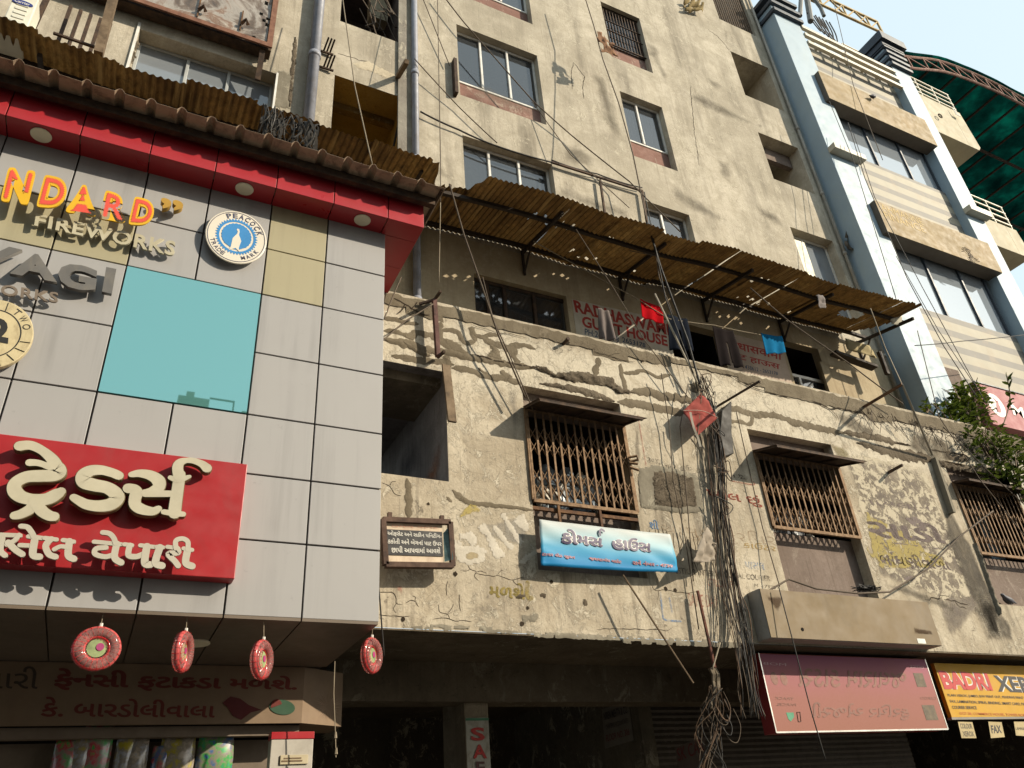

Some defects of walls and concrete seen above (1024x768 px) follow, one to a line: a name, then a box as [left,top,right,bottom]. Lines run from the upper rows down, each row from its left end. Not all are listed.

spalling [536,365,631,394]
peeling [844,454,976,630]
crack [380,566,523,622]